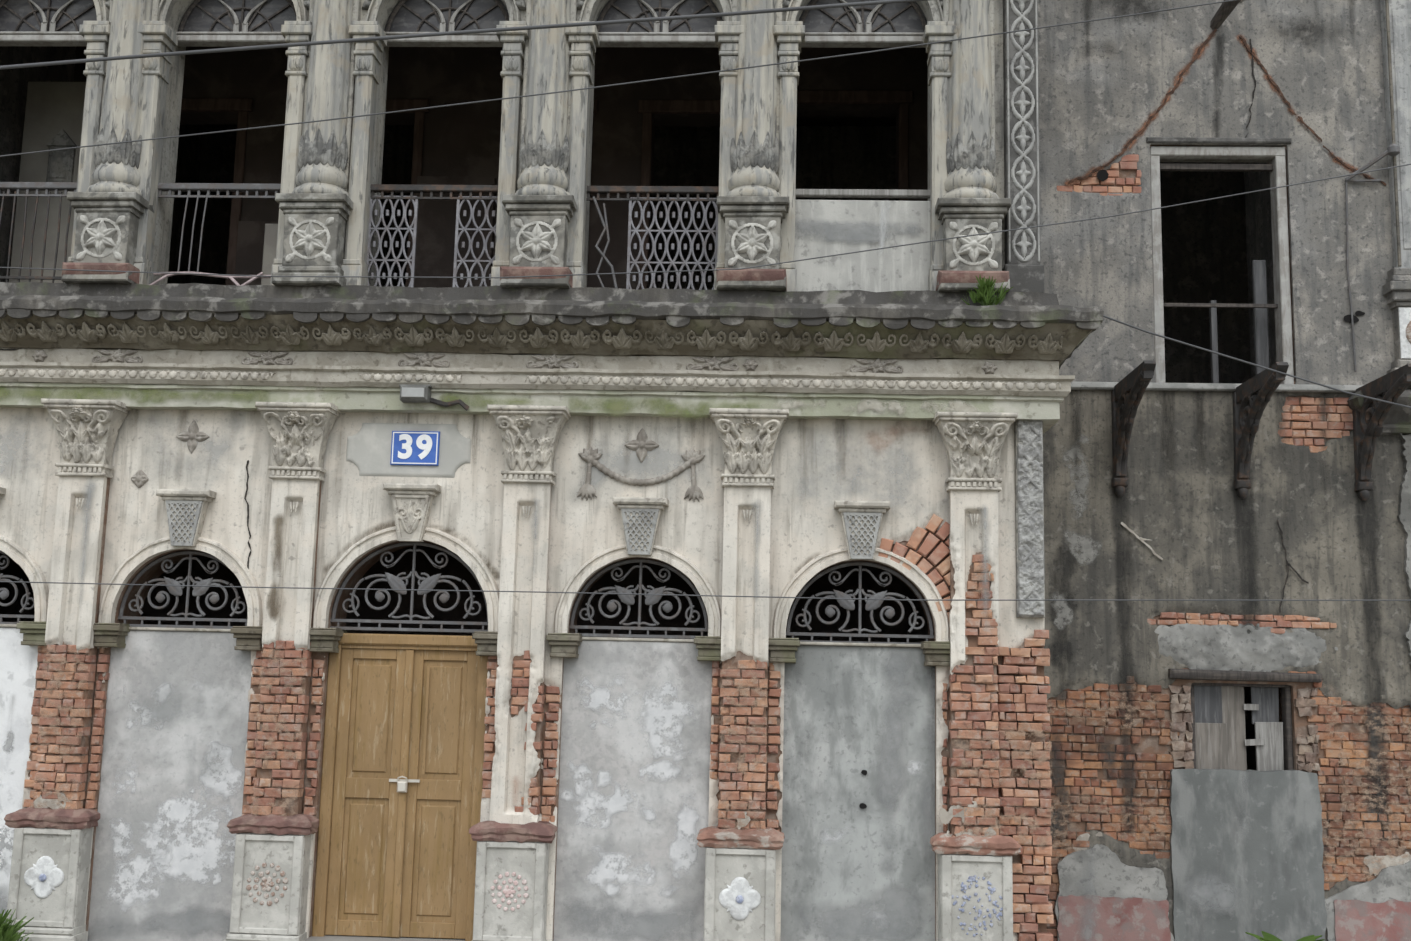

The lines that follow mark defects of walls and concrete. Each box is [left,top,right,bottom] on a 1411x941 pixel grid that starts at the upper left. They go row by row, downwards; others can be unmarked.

spalling [1057,154,1142,196]
flaking render [1063,436,1101,564]
spalling [1278,397,1353,453]
spalling [1147,612,1337,634]
spalling [3,644,171,811]
spalling [108,640,325,911]
spalling [482,650,656,829]
peeling [579,677,694,781]
peeling [587,803,699,896]
spalling [709,660,781,831]
spalling [878,514,1180,941]
spalling [1288,671,1411,891]